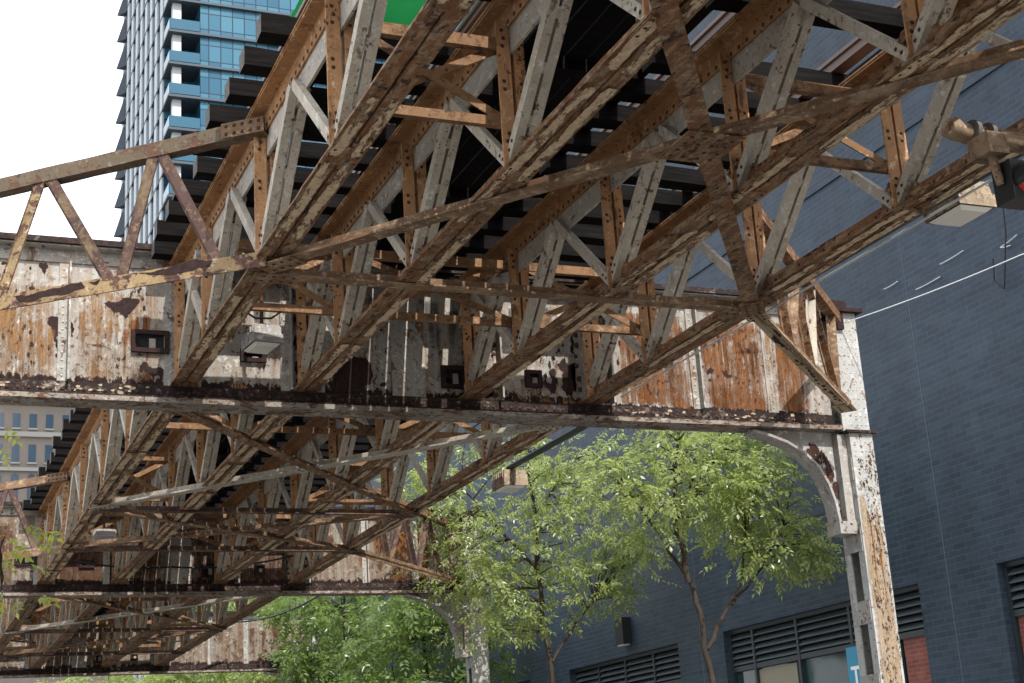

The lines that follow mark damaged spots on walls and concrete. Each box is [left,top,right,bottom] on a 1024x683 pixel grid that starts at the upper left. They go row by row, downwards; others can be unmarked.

peeling [818,0,1024,150]
peeling [732,157,796,204]
rust [0,304,54,377]
peeling [0,263,164,394]
rust [74,293,156,383]
peeling [141,259,213,275]
peeling [484,213,715,404]
rust [620,313,642,369]
rust [622,355,692,409]
rust [701,322,809,412]
rust [860,498,903,683]